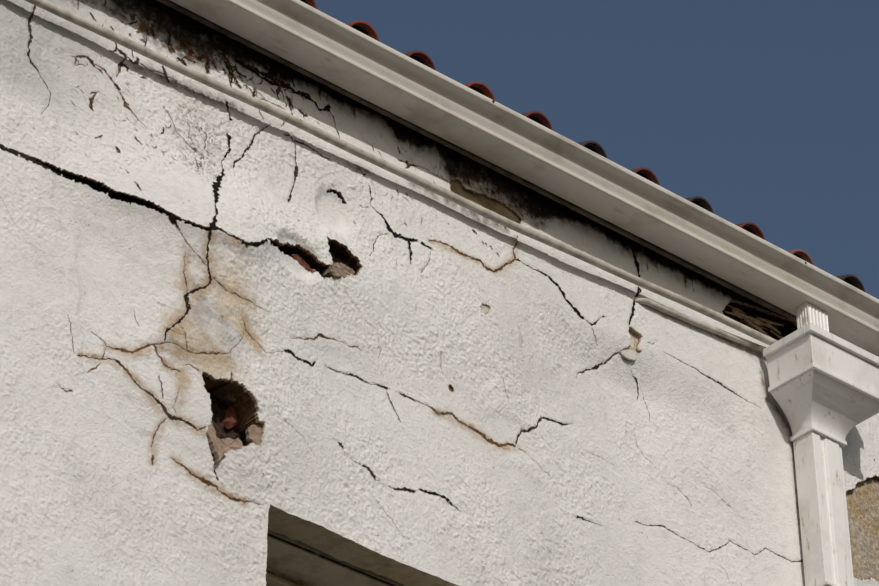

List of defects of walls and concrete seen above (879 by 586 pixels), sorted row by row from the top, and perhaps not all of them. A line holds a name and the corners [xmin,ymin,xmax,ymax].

damp [92,0,786,318]
spalling [433,167,523,228]
crack [0,5,607,511]
spalling [268,237,363,279]
crack [629,250,642,325]
damp [171,320,230,377]
crack [578,352,650,417]
crack [649,342,759,407]
spalling [722,300,797,341]
spalling [202,370,266,469]
crack [636,521,803,562]
spalling [846,475,879,582]